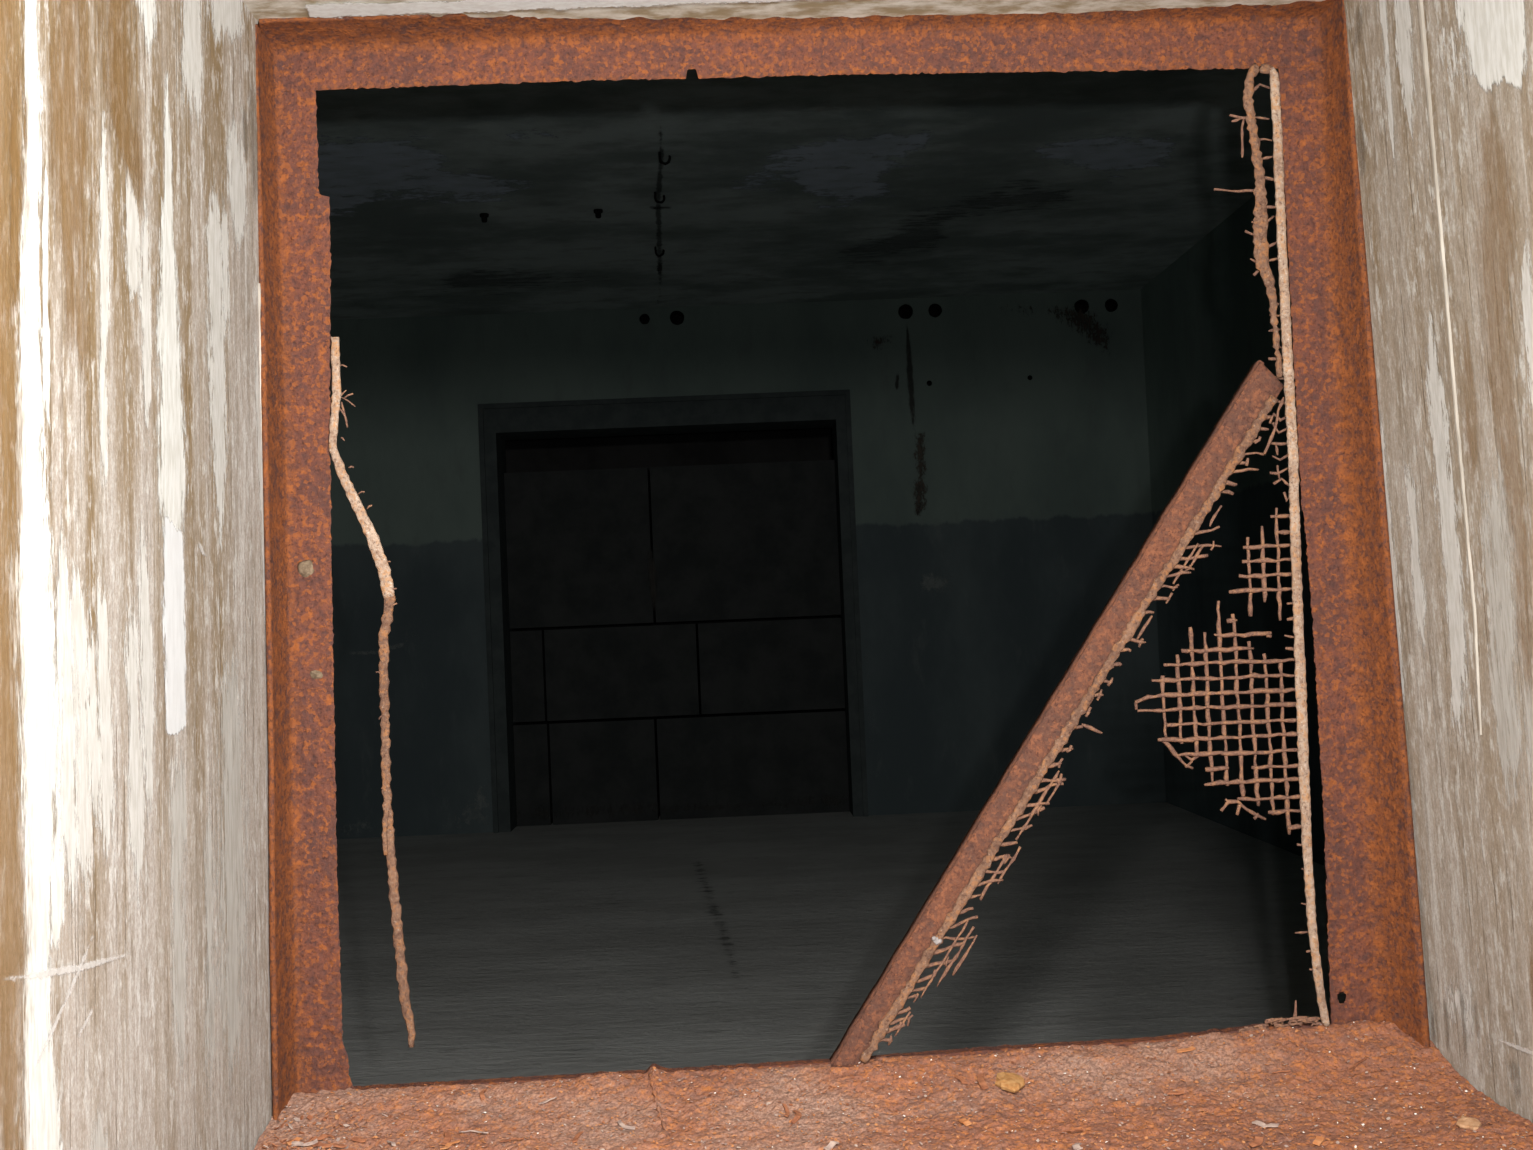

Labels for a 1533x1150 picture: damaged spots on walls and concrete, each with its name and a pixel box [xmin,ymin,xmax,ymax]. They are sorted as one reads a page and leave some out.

leakage [1379,0,1415,165]
leakage [0,0,189,1150]
leakage [205,121,247,551]
leakage [255,344,266,627]
rust [297,560,314,577]
leakage [1380,311,1468,740]
leakage [1481,459,1533,804]
leakage [1520,247,1533,408]
leakage [204,659,249,1090]
leakage [1442,958,1490,1062]